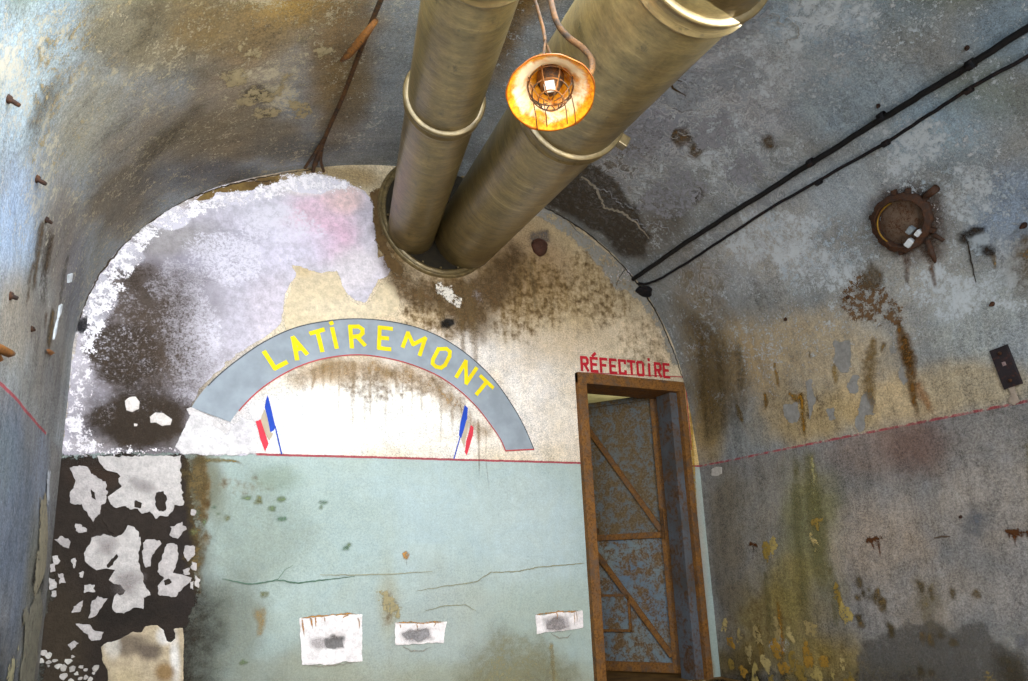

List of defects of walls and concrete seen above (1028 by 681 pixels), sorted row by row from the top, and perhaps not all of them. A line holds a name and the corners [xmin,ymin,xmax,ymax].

leakage [28,222,53,298]
leakage [45,309,54,346]
peeling [7,175,407,681]
leakage [63,171,362,579]
leakage [316,361,463,411]
crack [536,207,683,378]
rust [840,275,930,406]
crack [225,563,582,611]
leakage [719,577,1028,681]
rust [1005,528,1028,542]